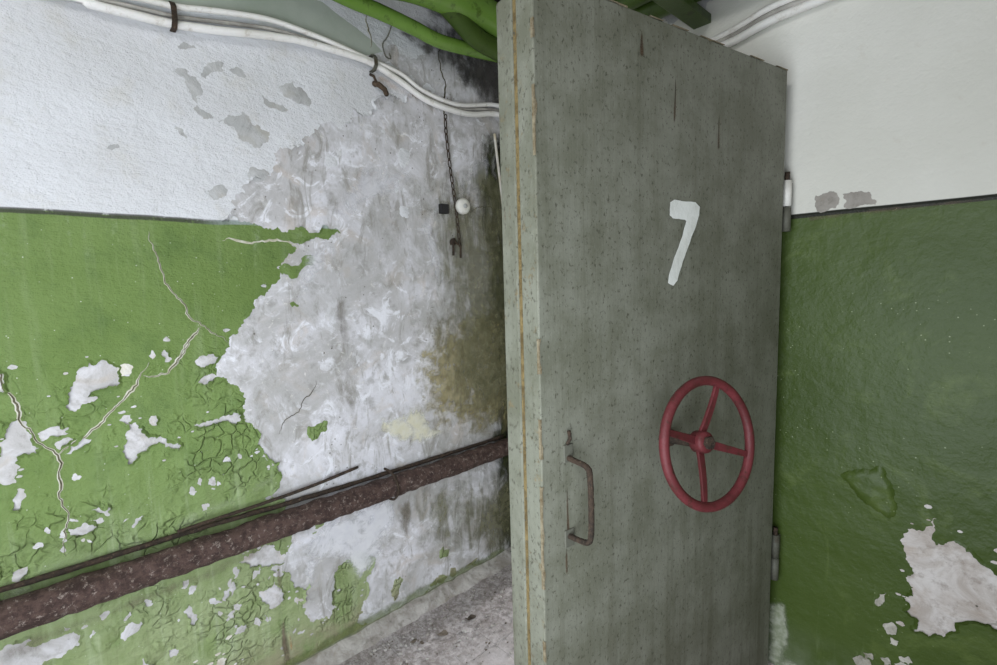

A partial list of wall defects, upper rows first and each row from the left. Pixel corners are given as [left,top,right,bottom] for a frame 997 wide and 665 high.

crack [223,238,297,246]
peeling [189,44,503,510]
leakage [382,134,508,442]
peeling [0,419,92,513]
peeling [33,502,113,553]
peeling [62,356,133,413]
crack [0,233,230,556]
peeling [107,405,184,466]
peeling [209,458,510,640]
leakage [432,455,511,549]
peeling [853,505,997,665]
peeling [0,625,96,665]